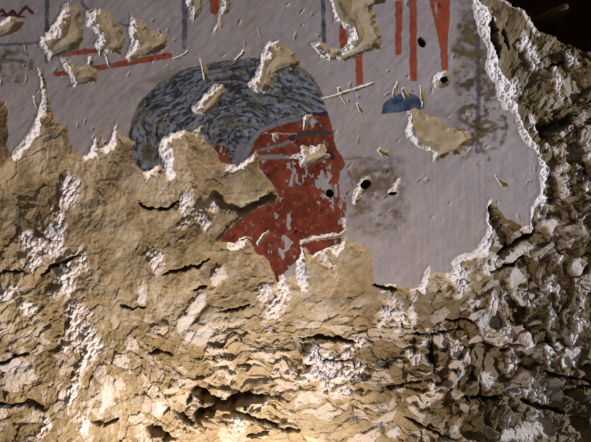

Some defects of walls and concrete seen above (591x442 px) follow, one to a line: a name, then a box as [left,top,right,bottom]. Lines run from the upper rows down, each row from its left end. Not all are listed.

flaking render [40,2,170,88]
flaking render [192,56,226,116]
flaking render [248,40,301,94]
flaking render [312,0,386,61]
flaking render [286,139,331,187]
flaking render [430,0,591,323]
flaking render [0,68,279,331]
crack [138,200,179,211]
crack [0,268,25,276]
crack [40,255,81,278]
crack [162,258,211,276]
flaking render [0,206,591,442]